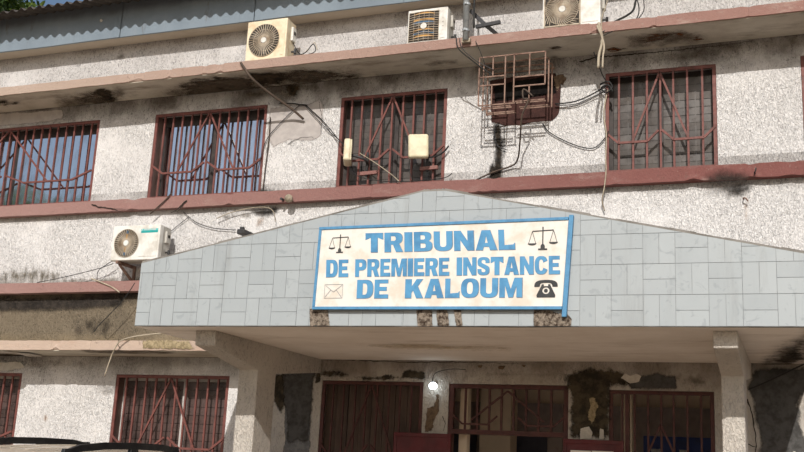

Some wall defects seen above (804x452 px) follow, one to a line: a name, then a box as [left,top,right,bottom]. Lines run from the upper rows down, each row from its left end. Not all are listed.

leakage [63,89,124,107]
leakage [489,123,505,179]
peeling [310,309,330,326]
peeling [416,310,462,326]
peeling [534,310,572,326]
leakage [766,341,804,365]
peeling [0,361,24,371]